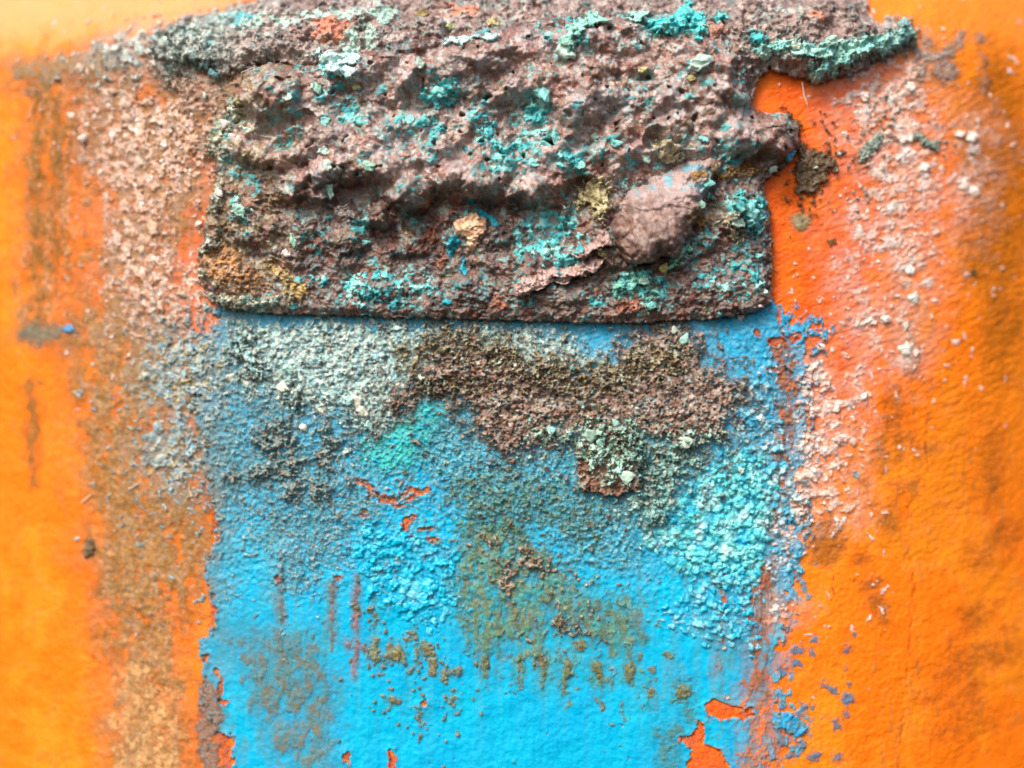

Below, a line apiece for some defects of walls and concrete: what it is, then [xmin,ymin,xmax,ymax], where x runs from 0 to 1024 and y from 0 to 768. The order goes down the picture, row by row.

peeling [751,330,813,354]
rust [357,229,811,696]
peeling [180,477,221,541]
peeling [354,477,440,577]
peeling [180,575,242,640]
peeling [217,732,231,768]
peeling [678,675,787,768]